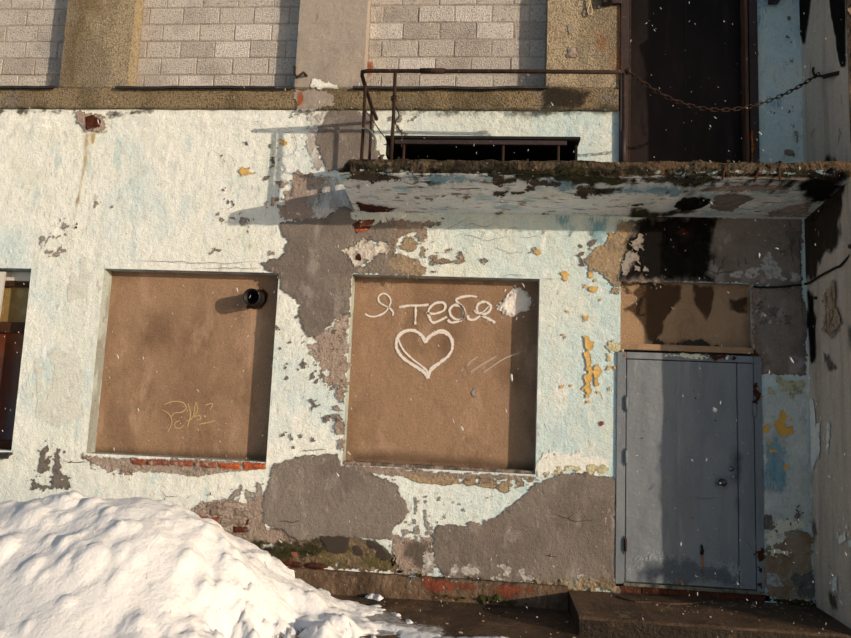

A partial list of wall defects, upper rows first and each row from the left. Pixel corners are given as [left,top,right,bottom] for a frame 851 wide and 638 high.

peeling [238,109,474,280]
spalling [491,159,561,198]
peeling [576,220,649,301]
water stain [629,208,702,253]
water stain [730,252,801,282]
water stain [624,283,719,346]
water stain [730,298,772,324]
peeling [560,335,624,404]
peeling [27,440,71,493]
flaking render [81,452,266,480]
peeling [762,376,830,606]
flaking render [192,482,446,583]